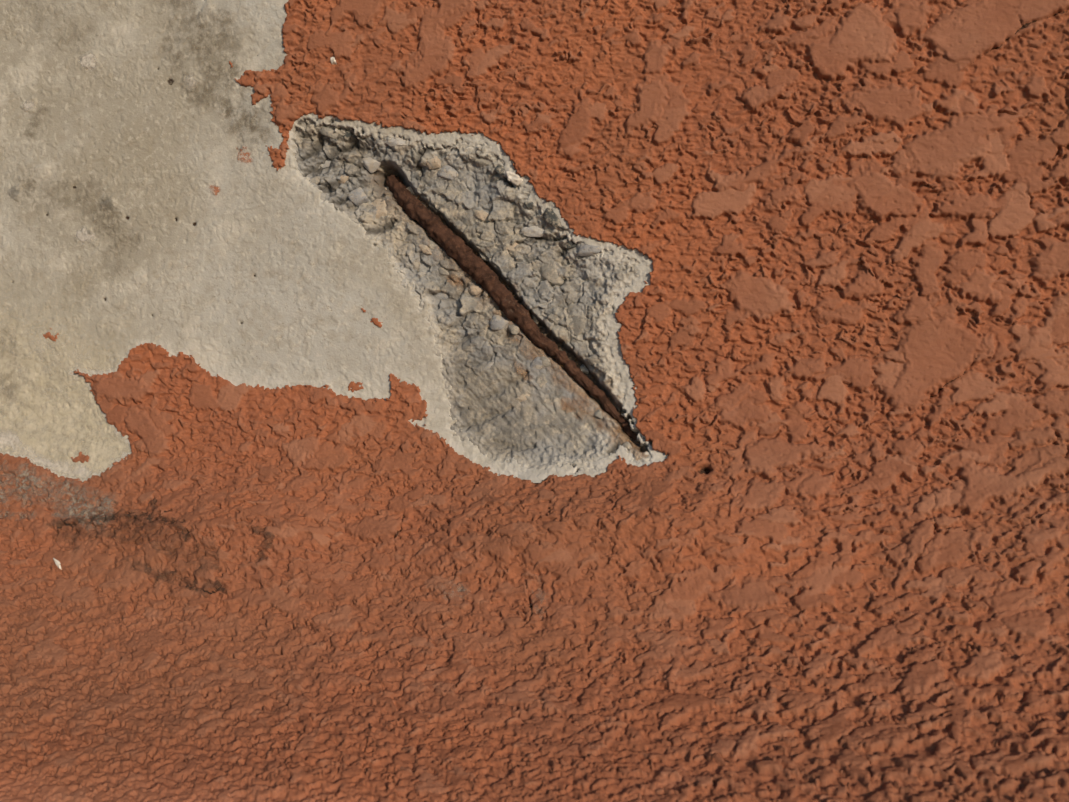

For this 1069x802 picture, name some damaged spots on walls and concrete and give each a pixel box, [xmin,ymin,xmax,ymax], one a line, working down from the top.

flaking render [0,0,668,483]